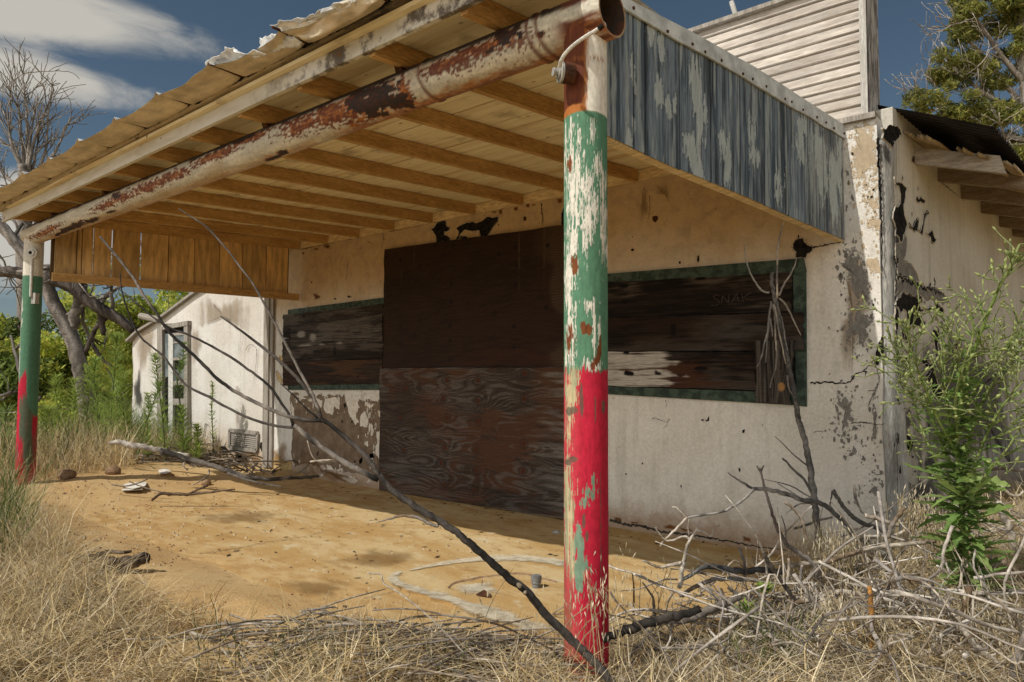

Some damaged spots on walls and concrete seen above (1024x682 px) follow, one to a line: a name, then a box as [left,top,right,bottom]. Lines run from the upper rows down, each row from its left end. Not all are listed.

peeling [271,390,380,484]
spalling [430,214,499,242]
crack [810,137,946,492]
peeling [828,121,951,399]